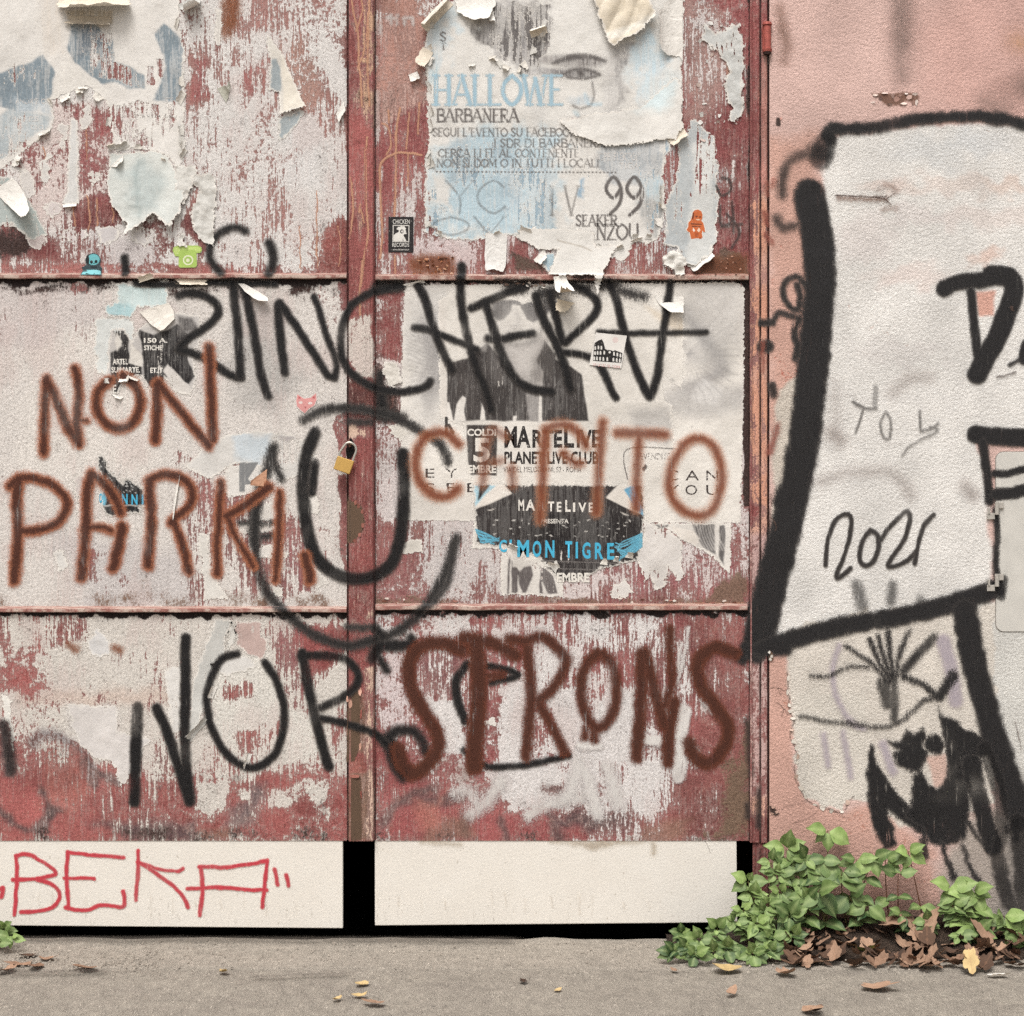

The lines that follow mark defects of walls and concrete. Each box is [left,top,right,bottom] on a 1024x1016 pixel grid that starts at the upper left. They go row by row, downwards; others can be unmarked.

spalling [870,91,919,106]